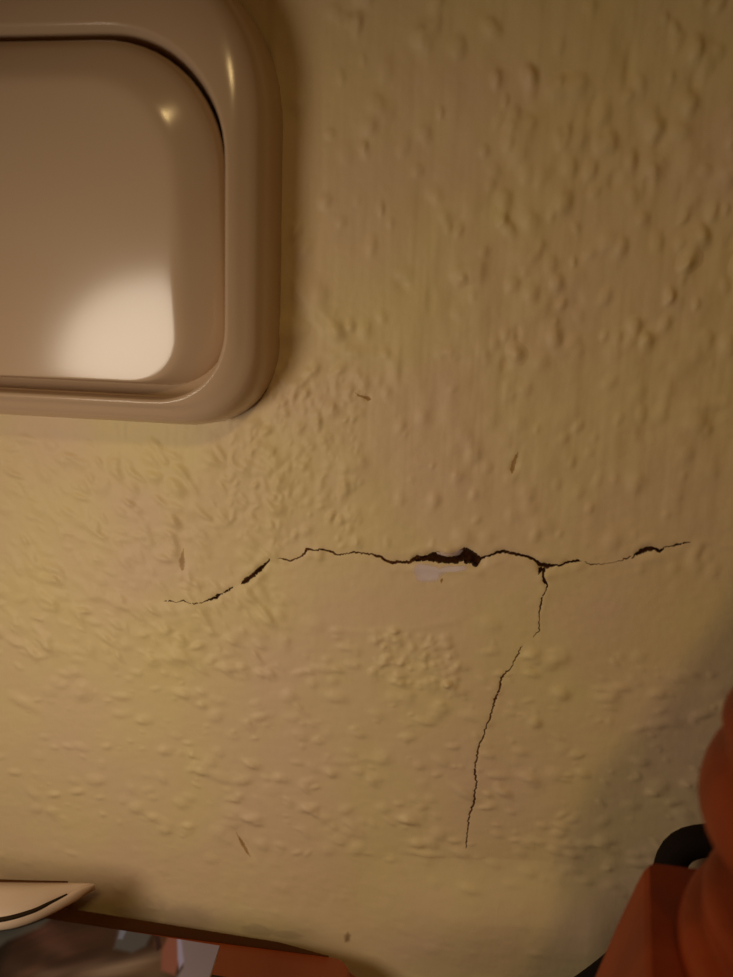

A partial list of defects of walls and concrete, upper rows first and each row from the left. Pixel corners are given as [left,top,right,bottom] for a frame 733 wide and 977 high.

crack [166,542,690,847]